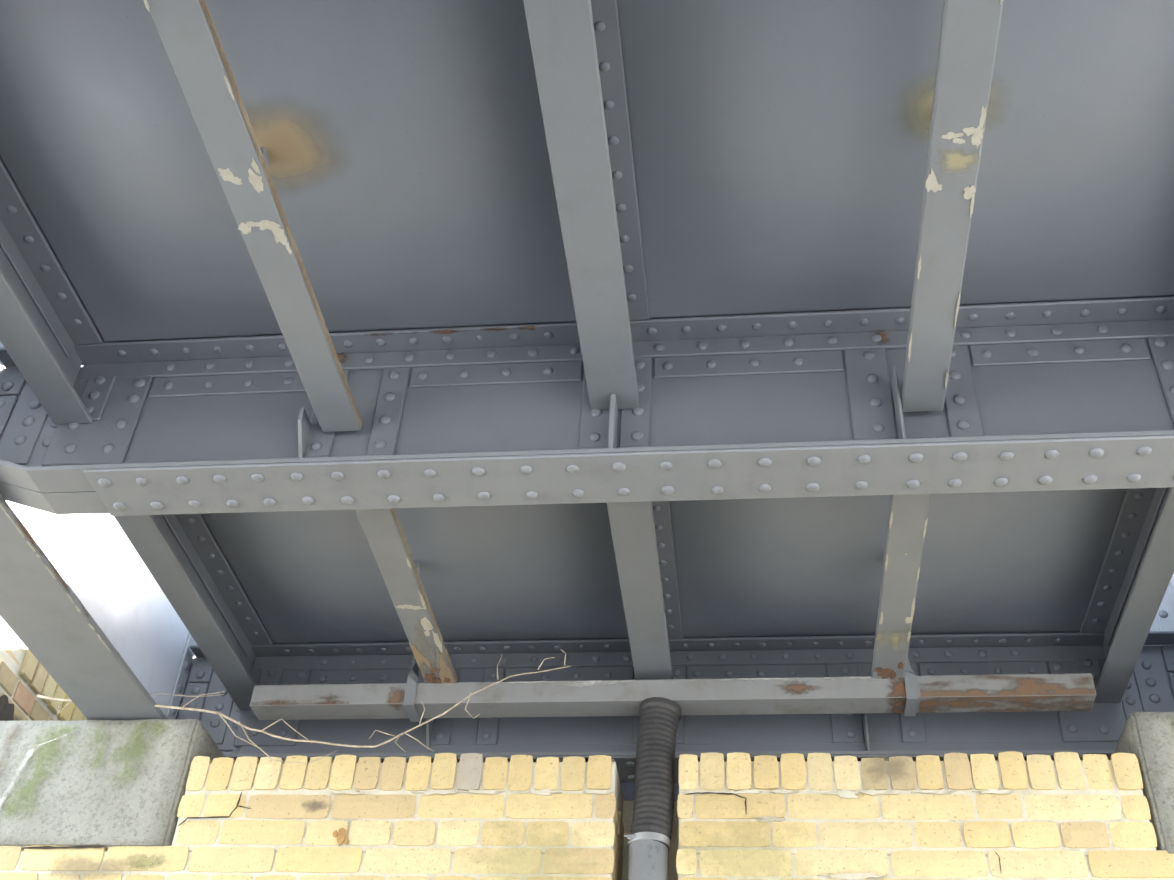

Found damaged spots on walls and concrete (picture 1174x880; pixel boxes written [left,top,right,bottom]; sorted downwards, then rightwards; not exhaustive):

peeling [941,106,986,148]
peeling [218,157,264,193]
peeling [925,170,943,192]
rust [200,0,362,428]
peeling [963,185,976,217]
peeling [238,220,292,254]
peeling [395,591,442,653]
peeling [424,668,451,683]
rust [782,683,813,694]
rust [888,676,1096,713]
damp [92,722,162,781]
damp [0,728,75,815]